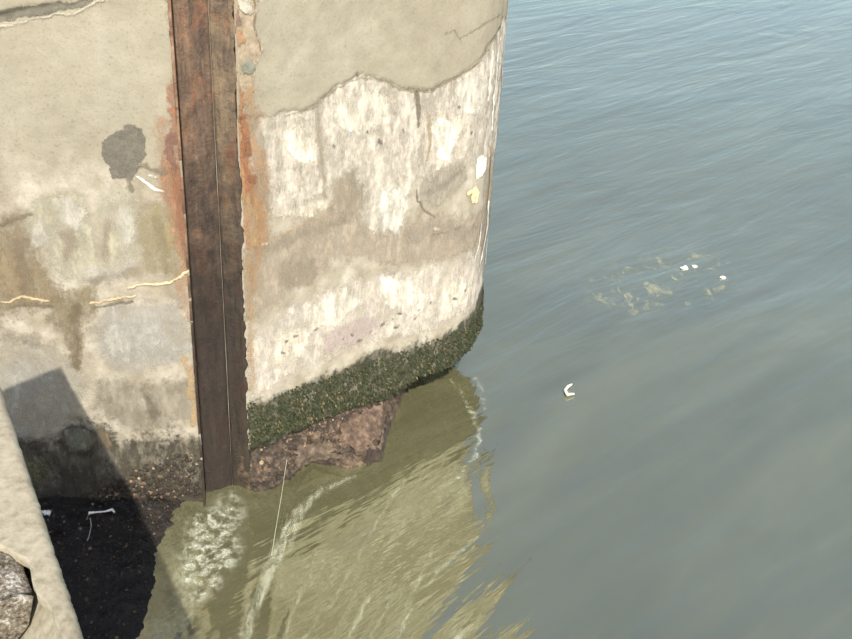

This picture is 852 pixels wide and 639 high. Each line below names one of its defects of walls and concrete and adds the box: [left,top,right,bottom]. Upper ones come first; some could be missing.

crack [0,0,104,27]
water stain [102,124,166,192]
corrosion [157,85,188,296]
corrosion [238,88,269,287]
peeling [246,11,508,397]
crack [1,295,51,308]
crack [89,270,189,308]